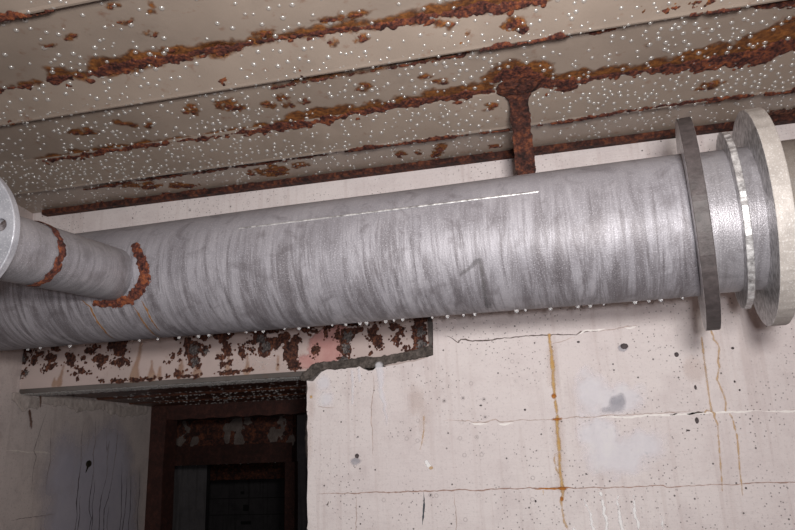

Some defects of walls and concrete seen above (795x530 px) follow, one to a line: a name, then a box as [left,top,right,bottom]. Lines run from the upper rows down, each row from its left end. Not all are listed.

rust [0,0,795,165]
rust [83,154,328,195]
spalling [299,324,433,381]
crack [448,325,637,344]
rust [701,331,727,425]
rust [548,334,568,528]
crack [444,409,795,426]
crack [322,482,795,524]